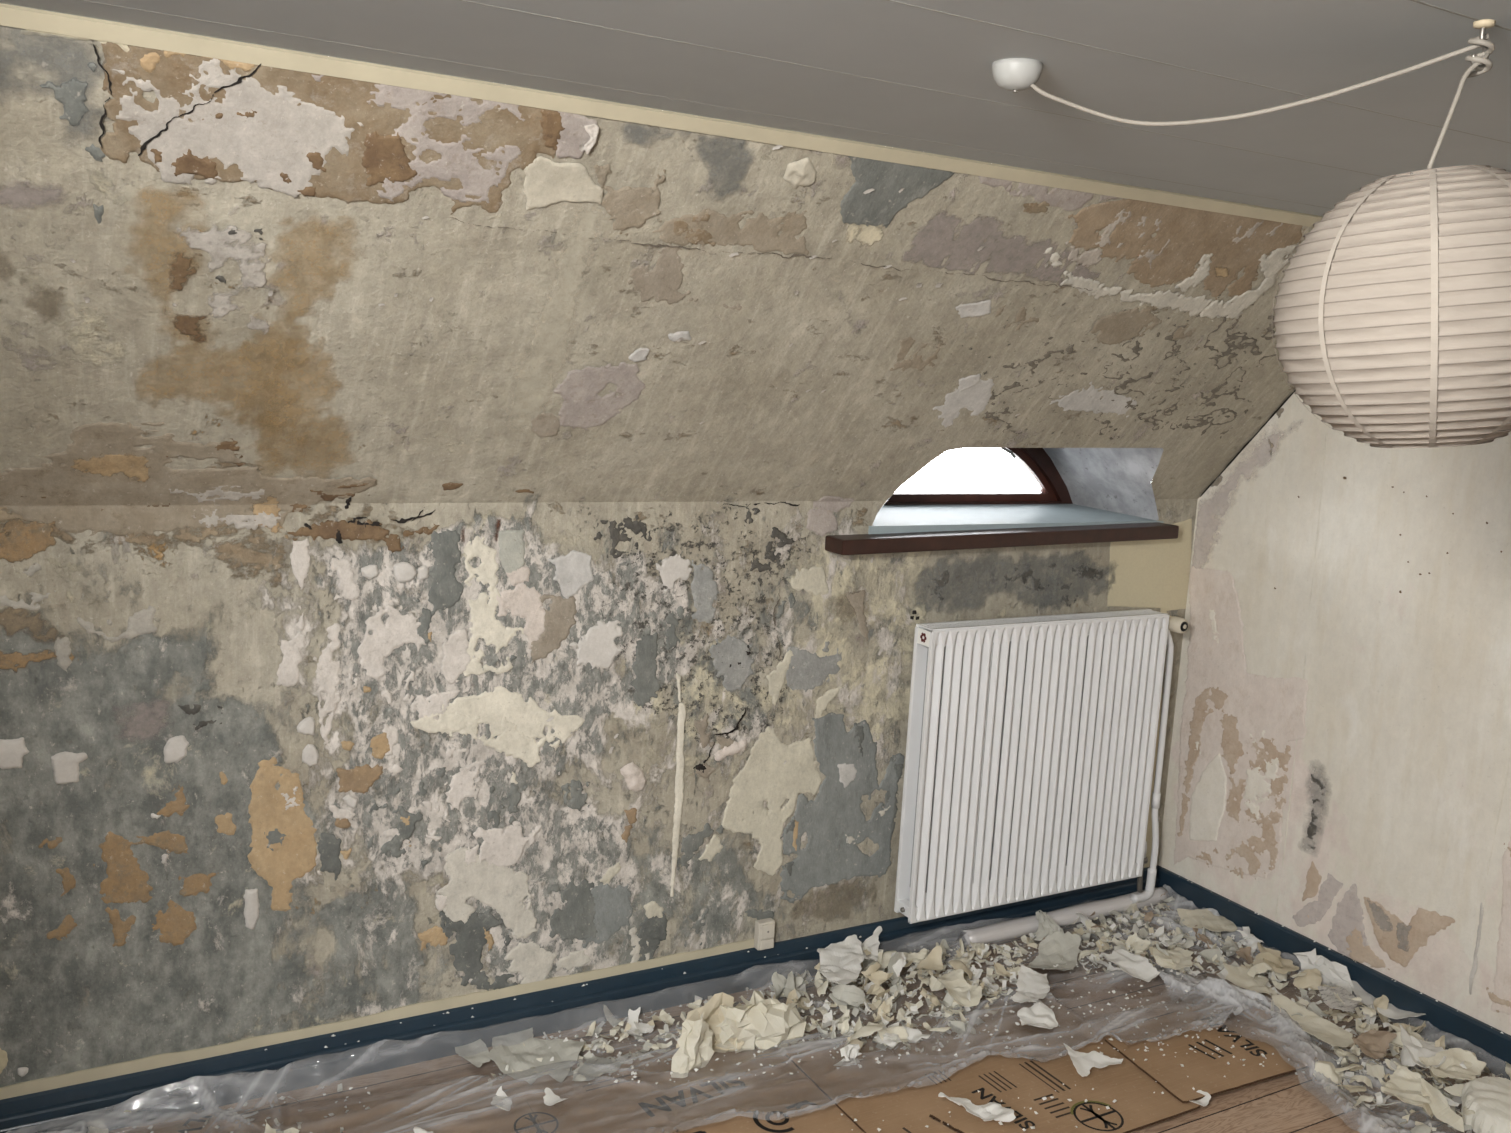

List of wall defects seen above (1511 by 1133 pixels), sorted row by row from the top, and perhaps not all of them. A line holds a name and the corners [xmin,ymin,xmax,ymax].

crack [93,44,112,147]
crack [138,64,261,156]
damp [140,191,204,297]
peeling [20,29,817,304]
peeling [832,156,955,246]
peeling [978,176,1305,345]
damp [140,222,349,469]
damp [915,551,1114,611]
damp [122,701,222,739]
peeling [0,422,905,991]
damp [1303,767,1327,850]
peeling [1292,861,1455,970]